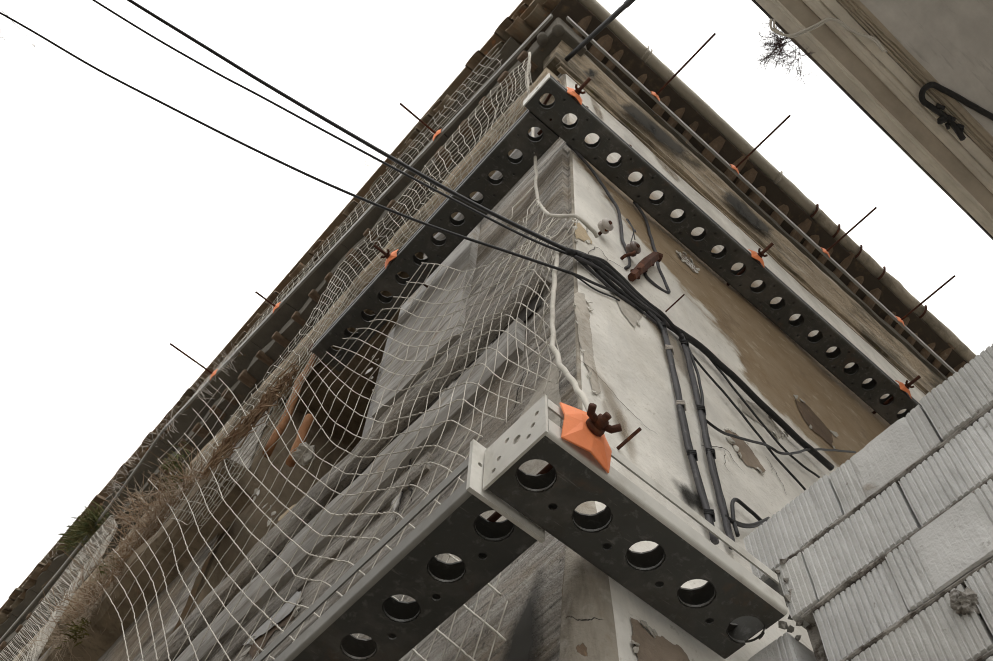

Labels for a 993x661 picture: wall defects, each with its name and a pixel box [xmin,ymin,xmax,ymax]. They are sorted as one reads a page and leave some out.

spalling [573,292,601,395]
peeling [793,395,839,449]
peeling [724,427,765,475]
peeling [630,617,690,661]